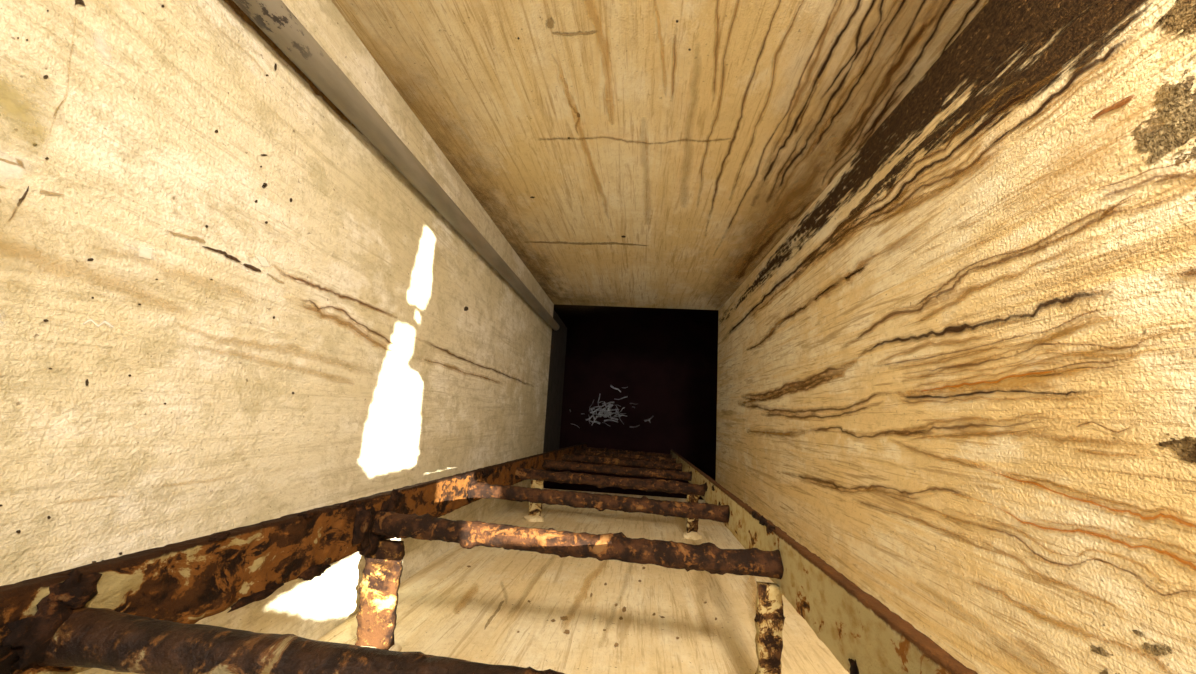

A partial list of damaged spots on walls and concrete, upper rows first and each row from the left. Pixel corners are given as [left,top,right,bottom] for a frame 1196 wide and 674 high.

spalling [1153,0,1196,37]
spalling [1131,51,1196,198]
leakage [701,0,1152,333]
crack [139,231,308,285]
peeling [1155,433,1196,463]
corrosion [993,472,1196,528]
corrosion [1003,510,1196,571]
peeling [1090,645,1116,674]
peeling [1132,630,1172,656]